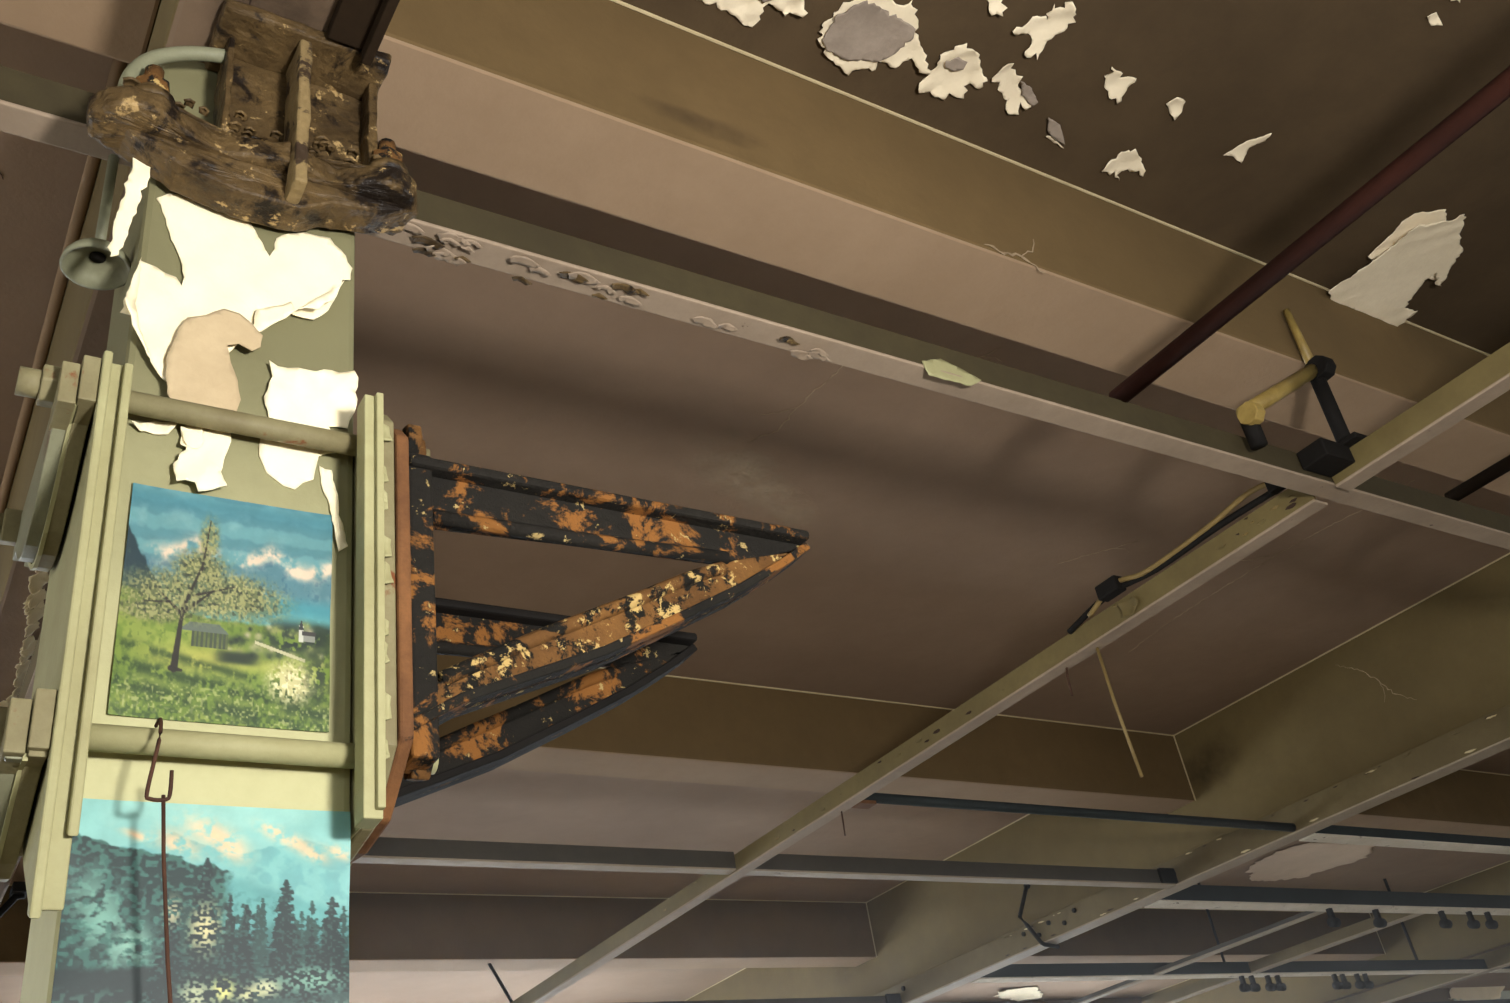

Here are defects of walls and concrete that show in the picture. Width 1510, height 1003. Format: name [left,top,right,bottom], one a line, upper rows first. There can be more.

peeling [702,0,808,27]
peeling [1427,0,1460,26]
peeling [818,0,1076,148]
peeling [1104,67,1137,104]
peeling [1166,97,1186,120]
peeling [1102,149,1146,178]
peeling [1223,133,1272,163]
peeling [1328,209,1466,327]
peeling [107,158,358,429]
peeling [132,421,231,492]
peeling [259,439,348,552]